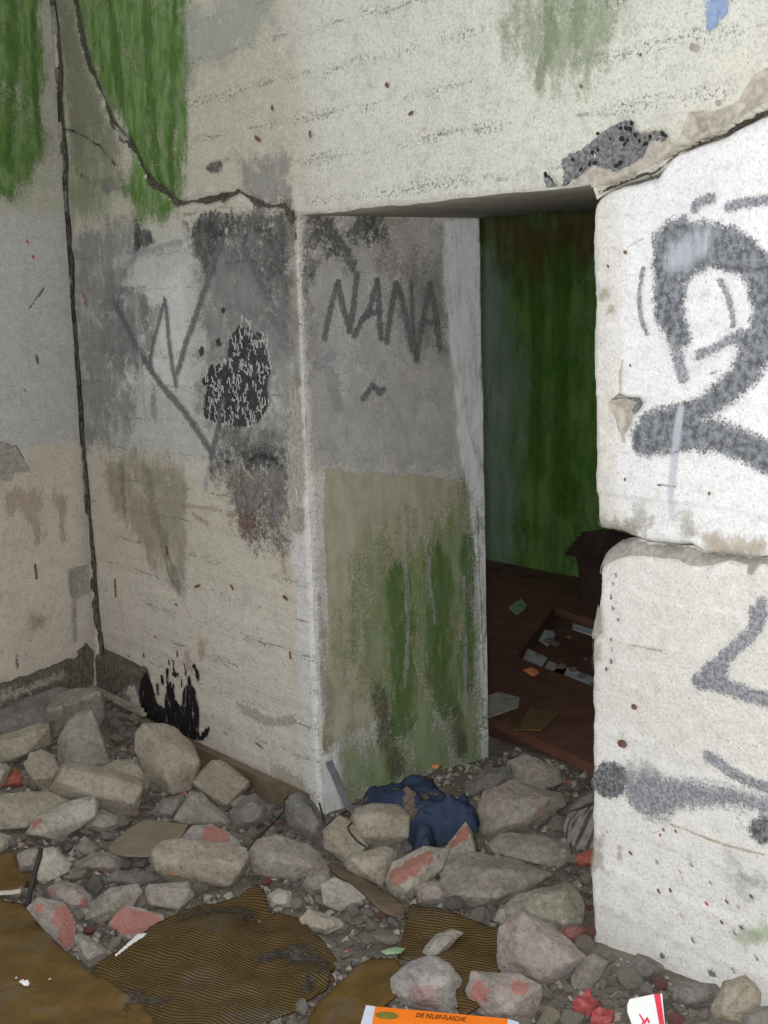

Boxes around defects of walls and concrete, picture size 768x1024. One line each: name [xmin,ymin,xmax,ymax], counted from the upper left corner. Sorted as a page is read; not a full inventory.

spalling [544,68,768,188]
crack [50,0,295,657]
water stain [479,262,514,562]
water stain [529,226,571,519]
spalling [608,370,643,442]
water stain [371,682,404,779]